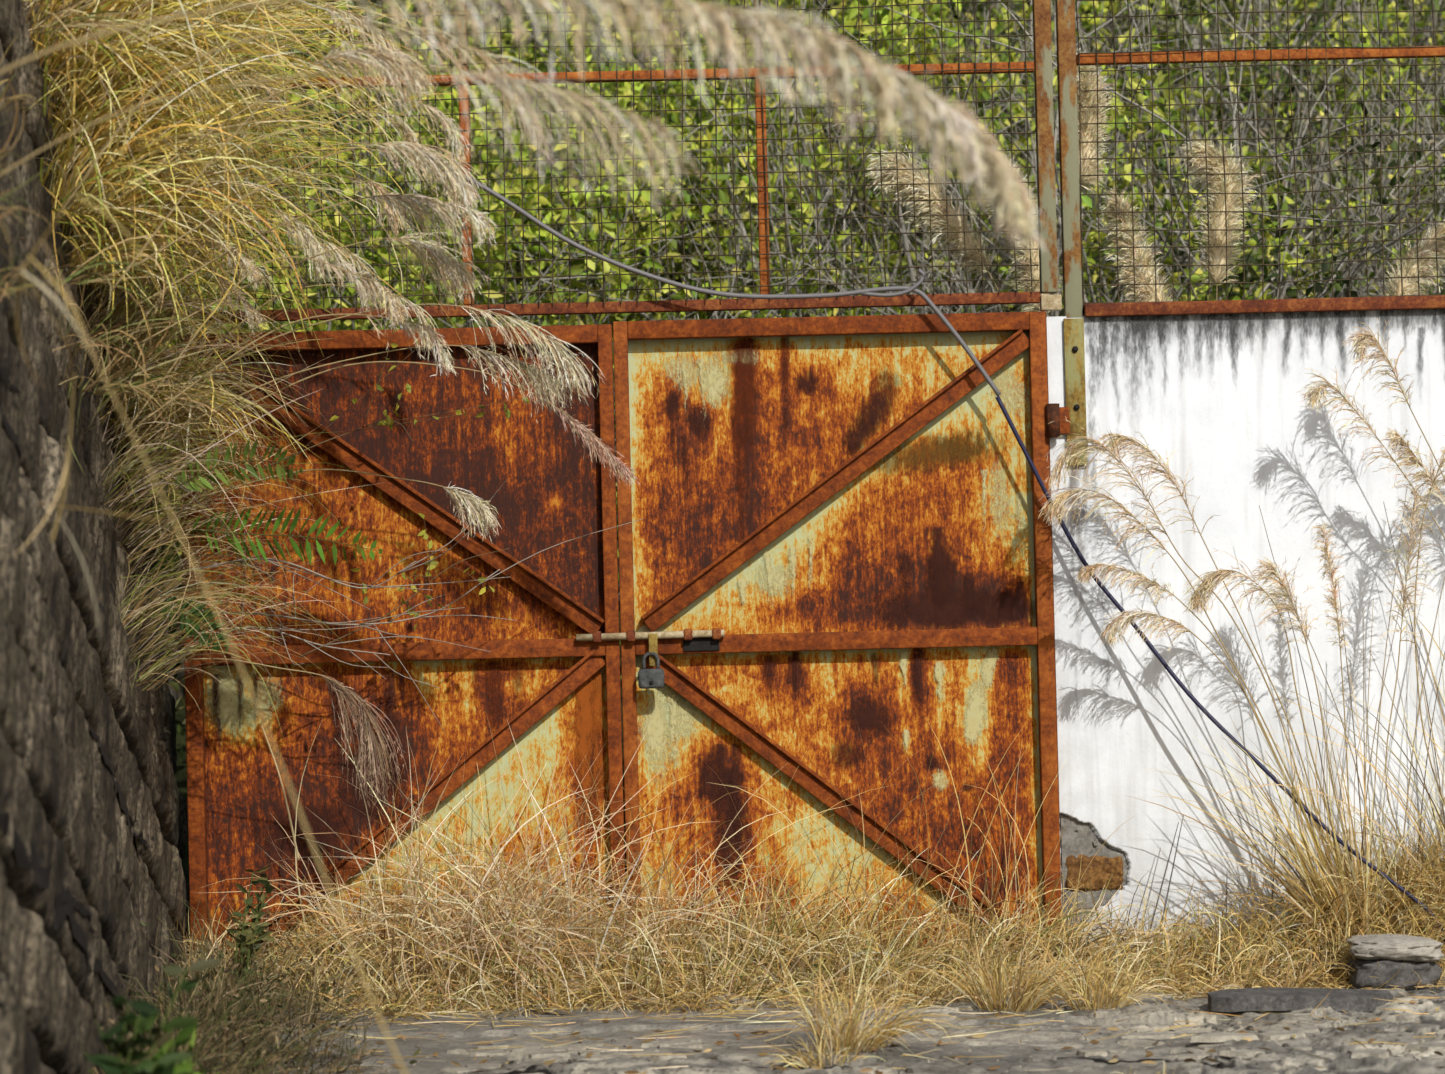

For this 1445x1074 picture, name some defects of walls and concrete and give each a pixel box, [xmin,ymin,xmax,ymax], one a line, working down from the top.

corrosion [782,338,818,393]
leakage [1087,309,1445,370]
corrosion [667,394,710,478]
corrosion [845,373,895,453]
corrosion [878,527,1027,628]
corrosion [238,674,257,714]
corrosion [263,670,403,851]
corrosion [571,667,604,855]
corrosion [701,744,750,879]
flaking render [1061,814,1129,932]
crack [504,1061,575,1074]
crack [757,1051,838,1070]